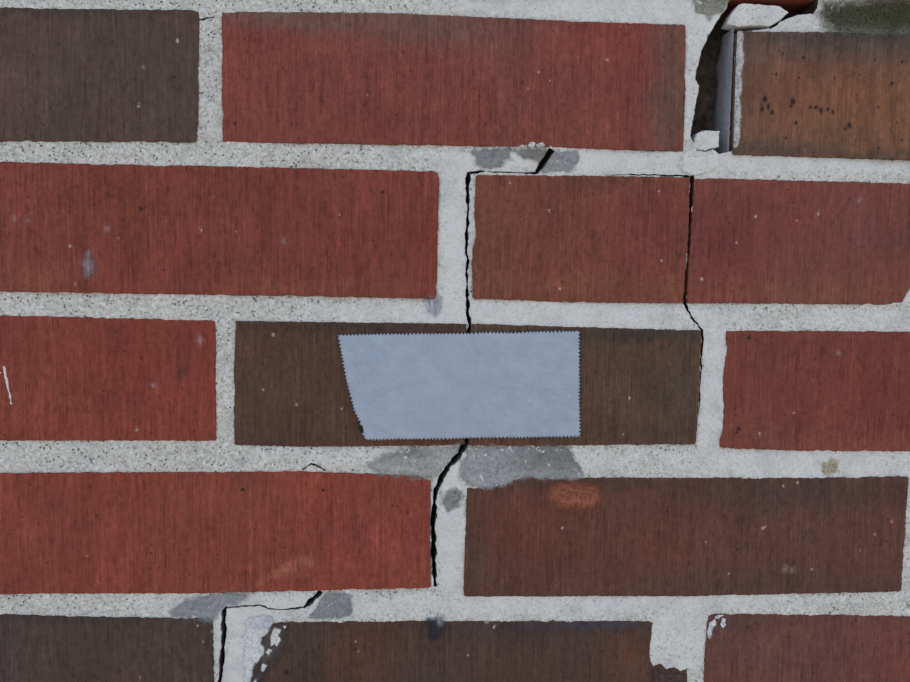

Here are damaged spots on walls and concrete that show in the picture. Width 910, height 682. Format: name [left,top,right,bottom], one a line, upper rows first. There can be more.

crack [464,148,555,334]
crack [611,174,704,414]
crack [430,437,469,585]
crack [217,591,323,682]
peeling [261,626,286,671]